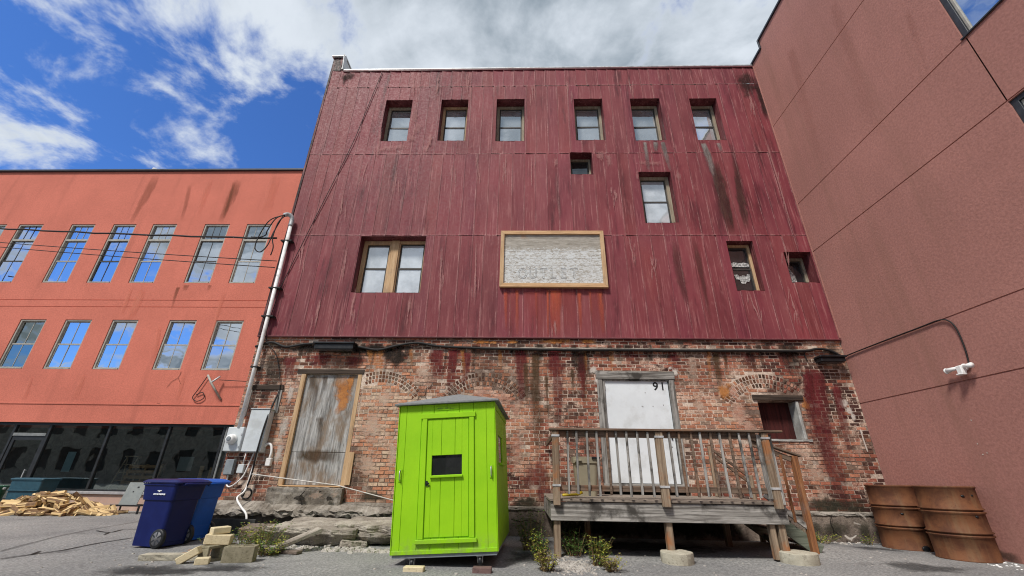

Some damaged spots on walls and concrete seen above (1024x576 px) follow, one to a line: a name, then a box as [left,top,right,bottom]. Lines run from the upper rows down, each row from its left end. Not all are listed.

leakage [701,143,748,221]
leakage [446,345,477,374]
leakage [524,344,626,405]
corrosion [310,377,354,411]
leakage [832,386,846,421]